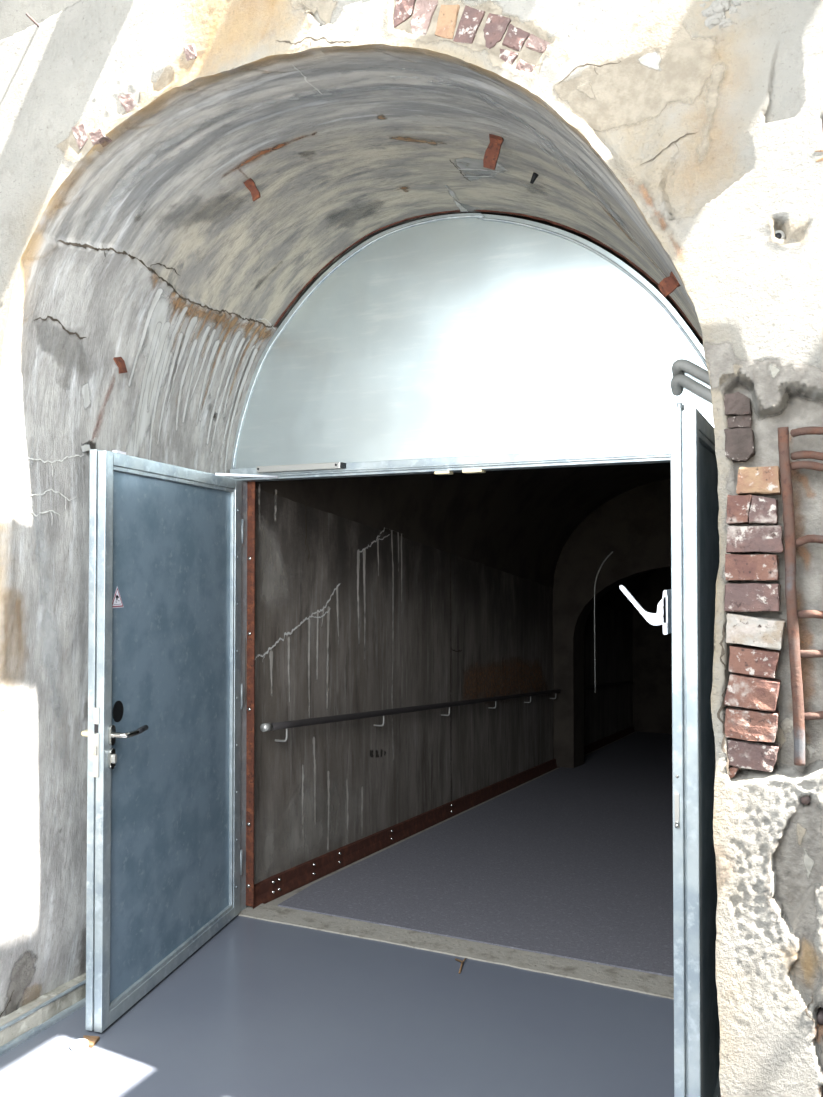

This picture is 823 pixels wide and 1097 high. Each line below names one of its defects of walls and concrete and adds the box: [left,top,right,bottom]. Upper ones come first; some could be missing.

spalling [385,0,570,81]
crack [58,240,275,329]
rust [168,291,271,393]
spalling [704,342,823,774]
rust [786,598,811,700]
spalling [765,798,823,1008]
spalling [815,1024,823,1069]